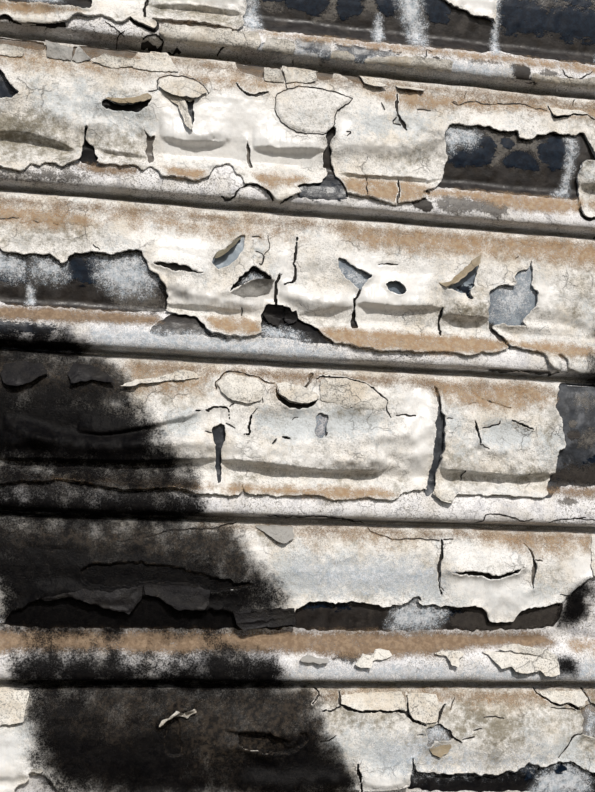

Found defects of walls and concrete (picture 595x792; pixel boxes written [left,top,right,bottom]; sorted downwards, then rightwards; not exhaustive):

peeling [159,0,595,73]
peeling [0,38,207,130]
peeling [438,124,595,200]
peeling [0,249,227,339]
peeling [439,254,481,299]
peeling [545,383,595,498]
leakage [0,305,595,792]
peeling [37,584,563,634]
crack [312,687,504,743]
crack [532,687,590,711]
crack [356,764,364,792]
peeling [408,761,595,792]